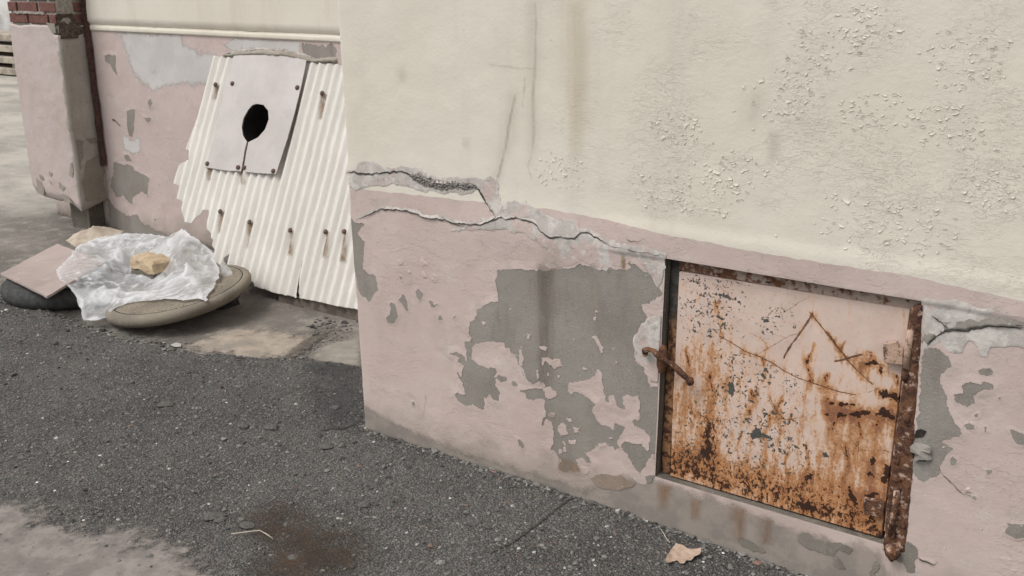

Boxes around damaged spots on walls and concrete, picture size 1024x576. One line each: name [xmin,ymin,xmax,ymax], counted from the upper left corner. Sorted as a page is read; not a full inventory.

peeling [298,41,341,65]
crack [346,96,661,256]
peeling [350,206,446,329]
peeling [443,258,663,491]
peeling [910,339,1011,493]
crack [921,316,1024,345]